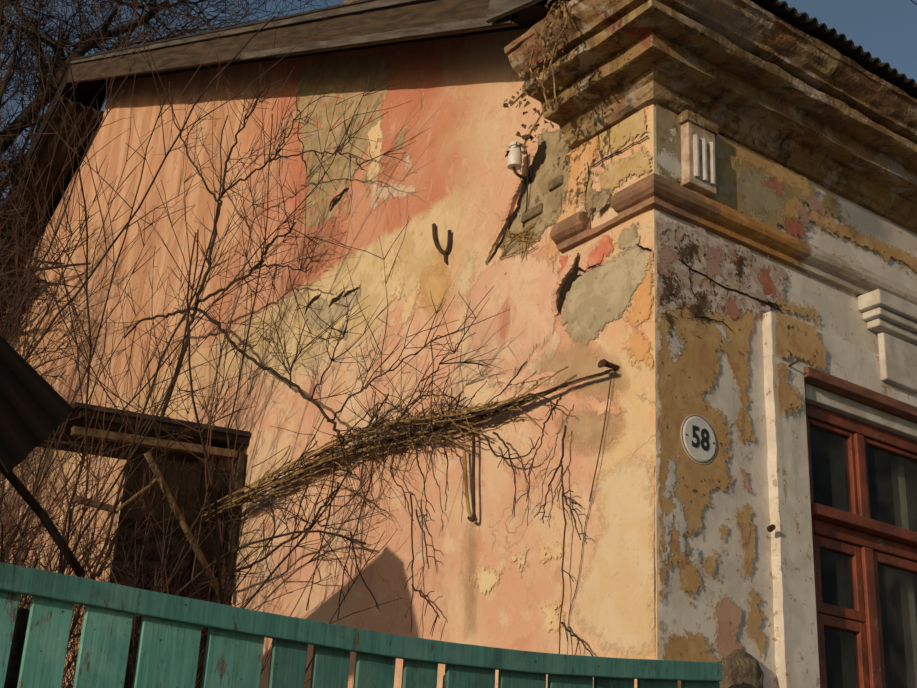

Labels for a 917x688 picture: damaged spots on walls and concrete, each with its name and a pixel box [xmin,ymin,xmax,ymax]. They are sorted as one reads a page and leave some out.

flaking render [455,103,917,303]
crack [551,253,604,316]
damp [657,218,788,338]
crack [679,259,782,334]
peeling [560,219,829,665]
peeling [468,566,504,595]
peeling [540,602,565,632]